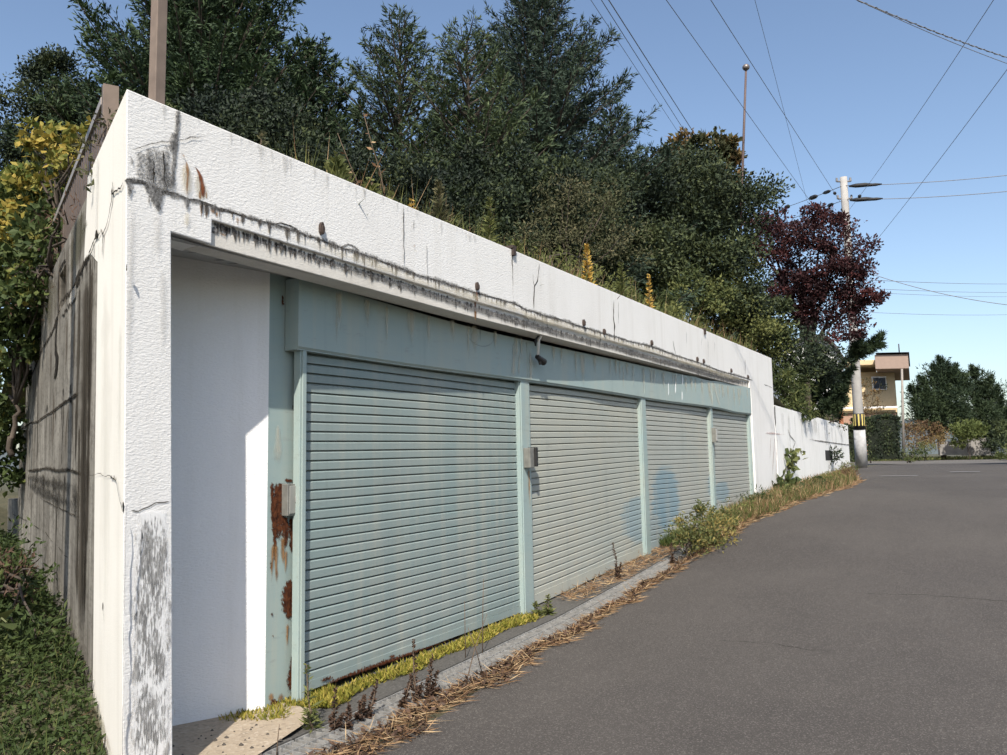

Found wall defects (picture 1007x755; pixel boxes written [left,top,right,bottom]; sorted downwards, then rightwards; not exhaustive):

leakage [128,110,180,211]
rust [183,155,218,216]
crack [31,136,795,448]
leakage [201,202,748,397]
leakage [21,212,93,620]
crack [88,473,169,559]
rust [270,478,293,642]